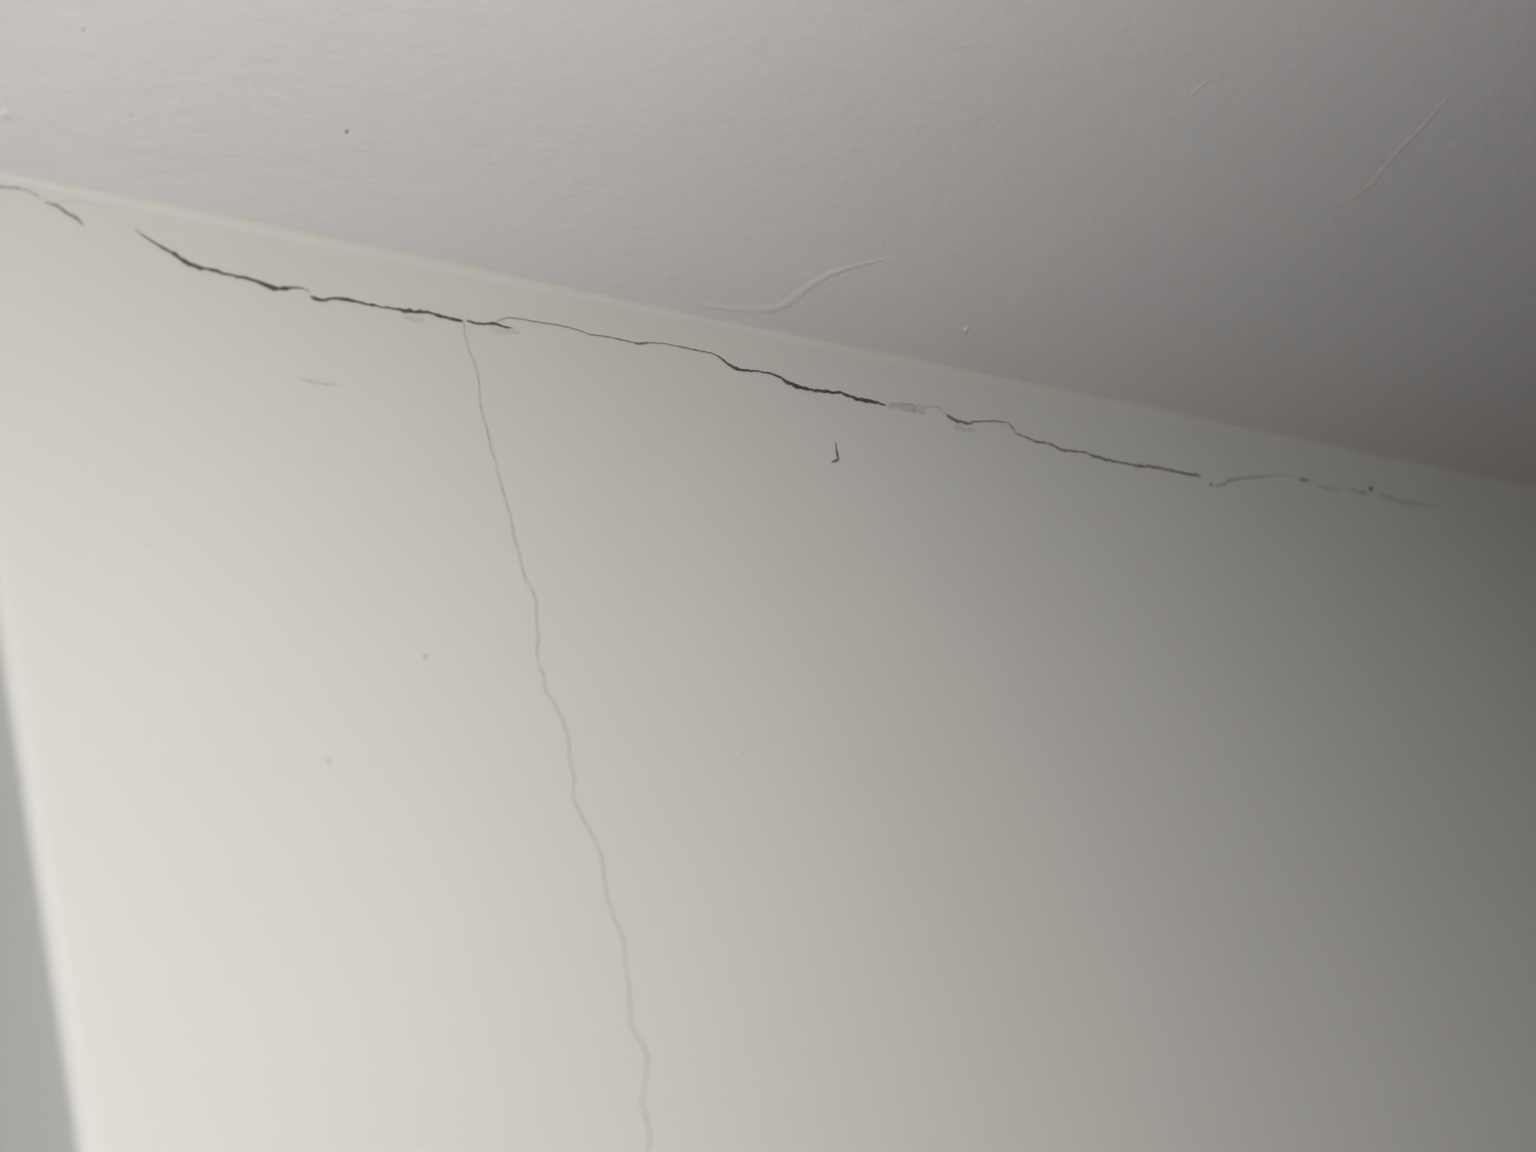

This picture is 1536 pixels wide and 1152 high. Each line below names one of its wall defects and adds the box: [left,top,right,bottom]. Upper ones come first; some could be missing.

crack [0,186,81,222]
crack [138,231,885,405]
crack [947,415,1212,486]